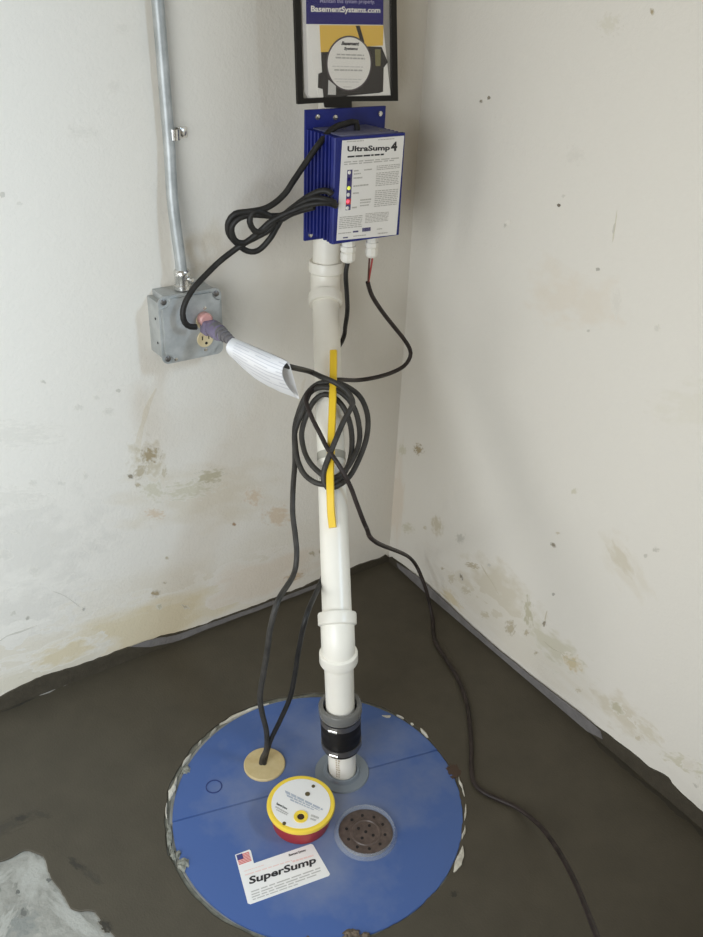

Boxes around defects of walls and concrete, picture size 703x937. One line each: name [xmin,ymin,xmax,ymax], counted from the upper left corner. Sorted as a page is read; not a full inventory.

leakage [0,457,321,696]
leakage [400,510,668,752]